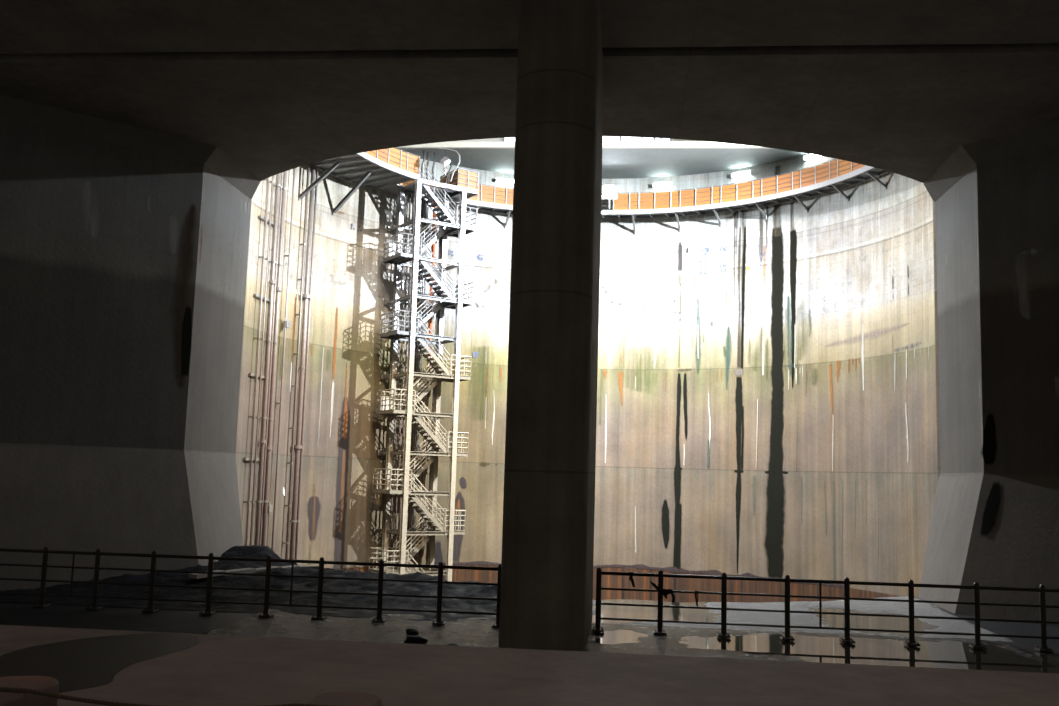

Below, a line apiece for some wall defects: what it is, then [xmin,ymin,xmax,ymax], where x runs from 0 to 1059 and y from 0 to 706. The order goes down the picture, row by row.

water stain [594,203,844,588]
rust [829,358,860,432]
water stain [308,496,320,539]